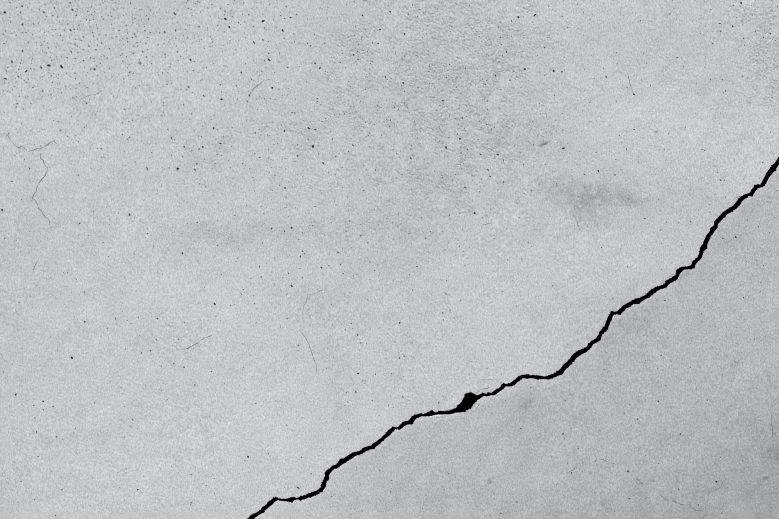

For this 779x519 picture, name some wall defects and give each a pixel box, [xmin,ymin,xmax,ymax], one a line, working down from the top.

crack [247,157,779,519]